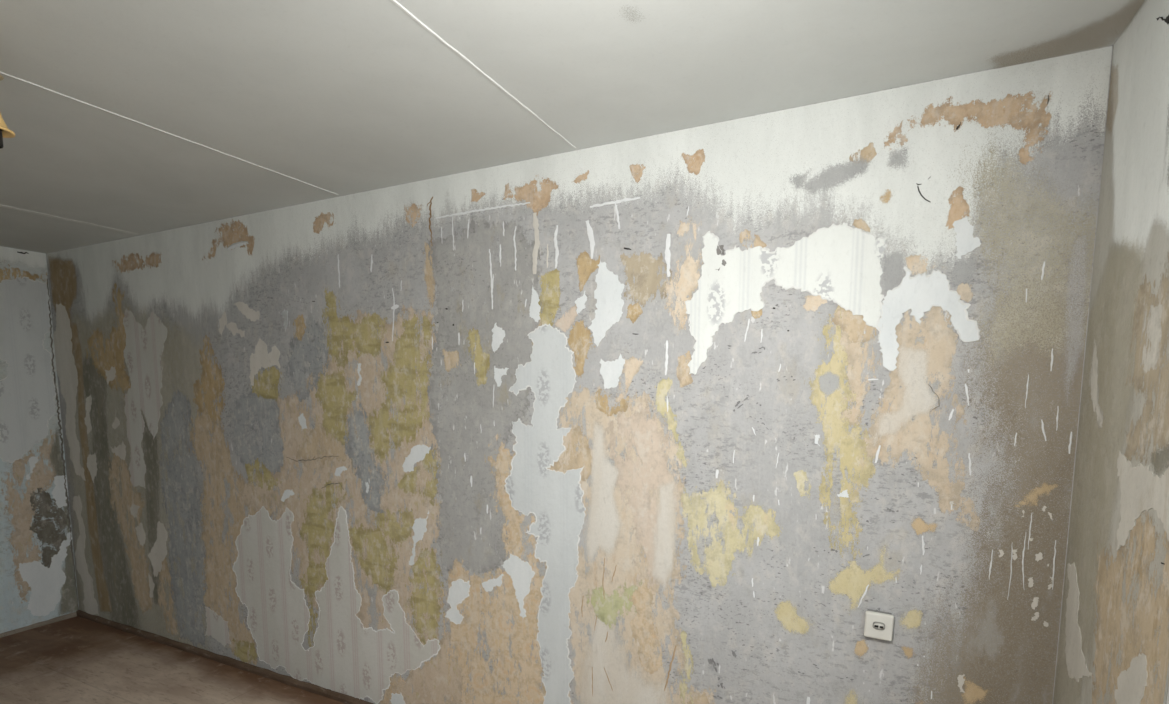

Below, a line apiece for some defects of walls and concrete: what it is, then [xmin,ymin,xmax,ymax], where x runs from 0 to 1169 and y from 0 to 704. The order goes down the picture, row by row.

water stain [436,202,559,309]
spalling [500,175,559,216]
water stain [586,197,640,259]
flaking render [620,215,727,334]
spalling [681,149,705,175]
spalling [849,89,1062,165]
spalling [946,186,970,229]
peeling [492,323,513,387]
flaking render [237,242,462,645]
flaking render [803,295,989,538]
flaking render [1,430,72,604]
flaking render [547,351,716,704]